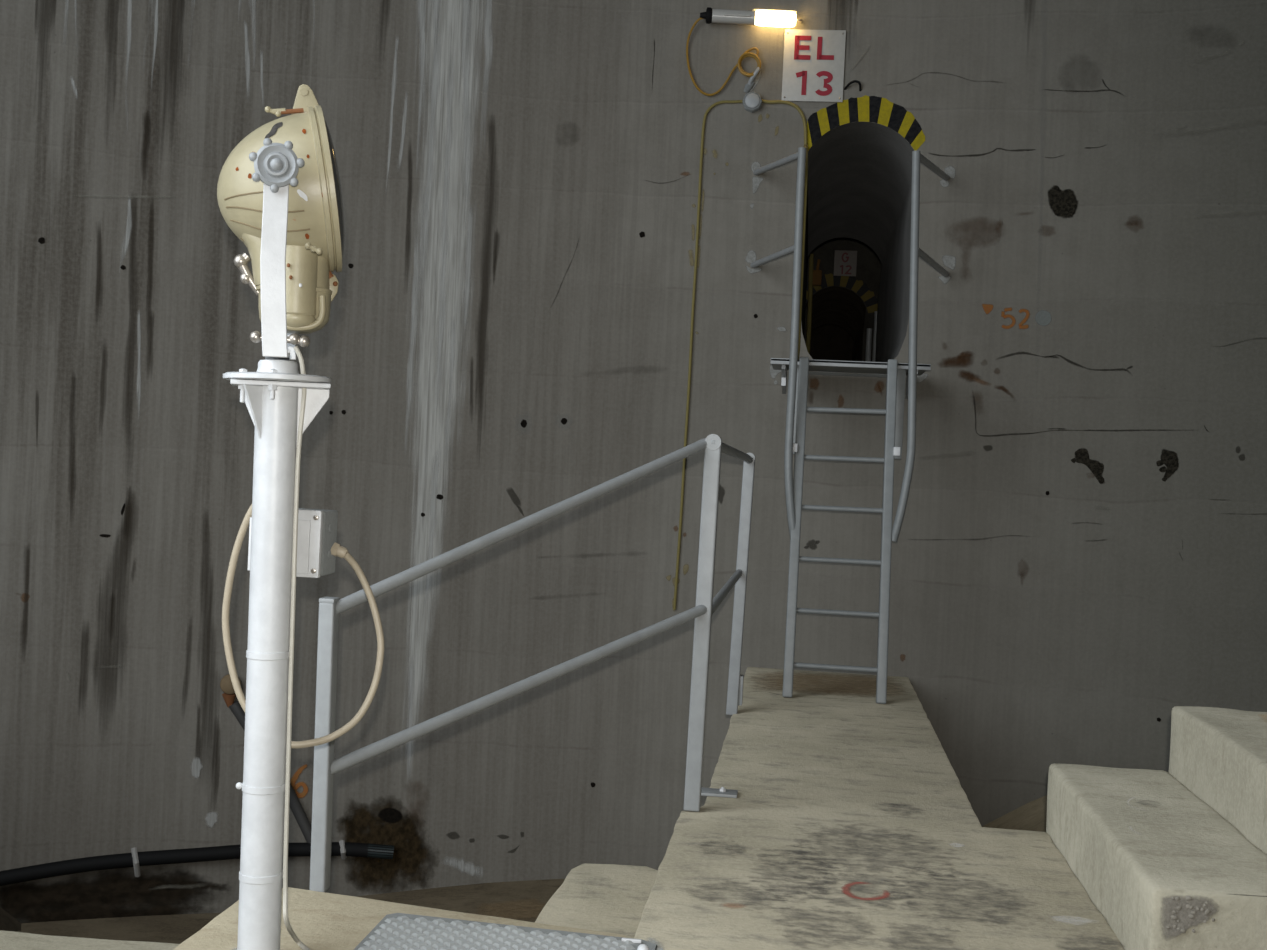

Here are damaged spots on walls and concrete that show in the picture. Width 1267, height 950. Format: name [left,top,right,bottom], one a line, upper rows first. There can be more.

crack [1048,81,1119,93]
damp [388,0,498,759]
corrosion [945,352,975,380]
crack [1004,352,1132,371]
crack [974,401,1164,436]
damp [340,801,433,889]
spalling [1162,896,1217,938]